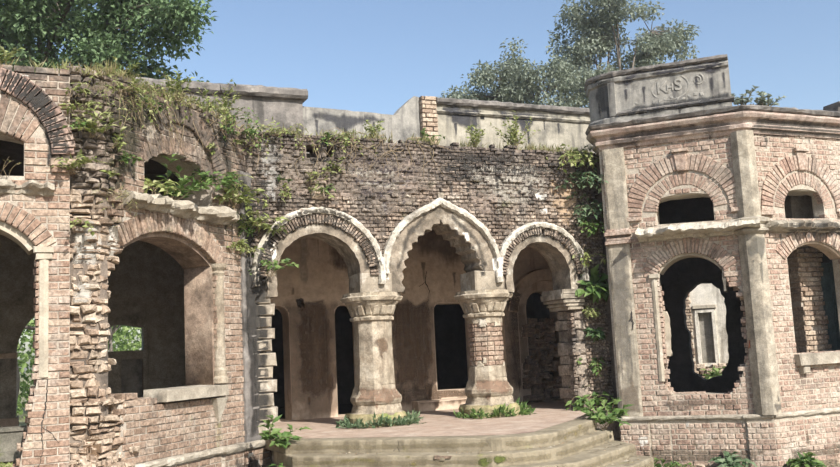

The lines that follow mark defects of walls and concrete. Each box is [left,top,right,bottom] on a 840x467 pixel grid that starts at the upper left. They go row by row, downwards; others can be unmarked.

leakage [314,113,381,133]
crack [38,379,59,467]
flaking render [69,219,127,467]
leakage [225,178,351,436]